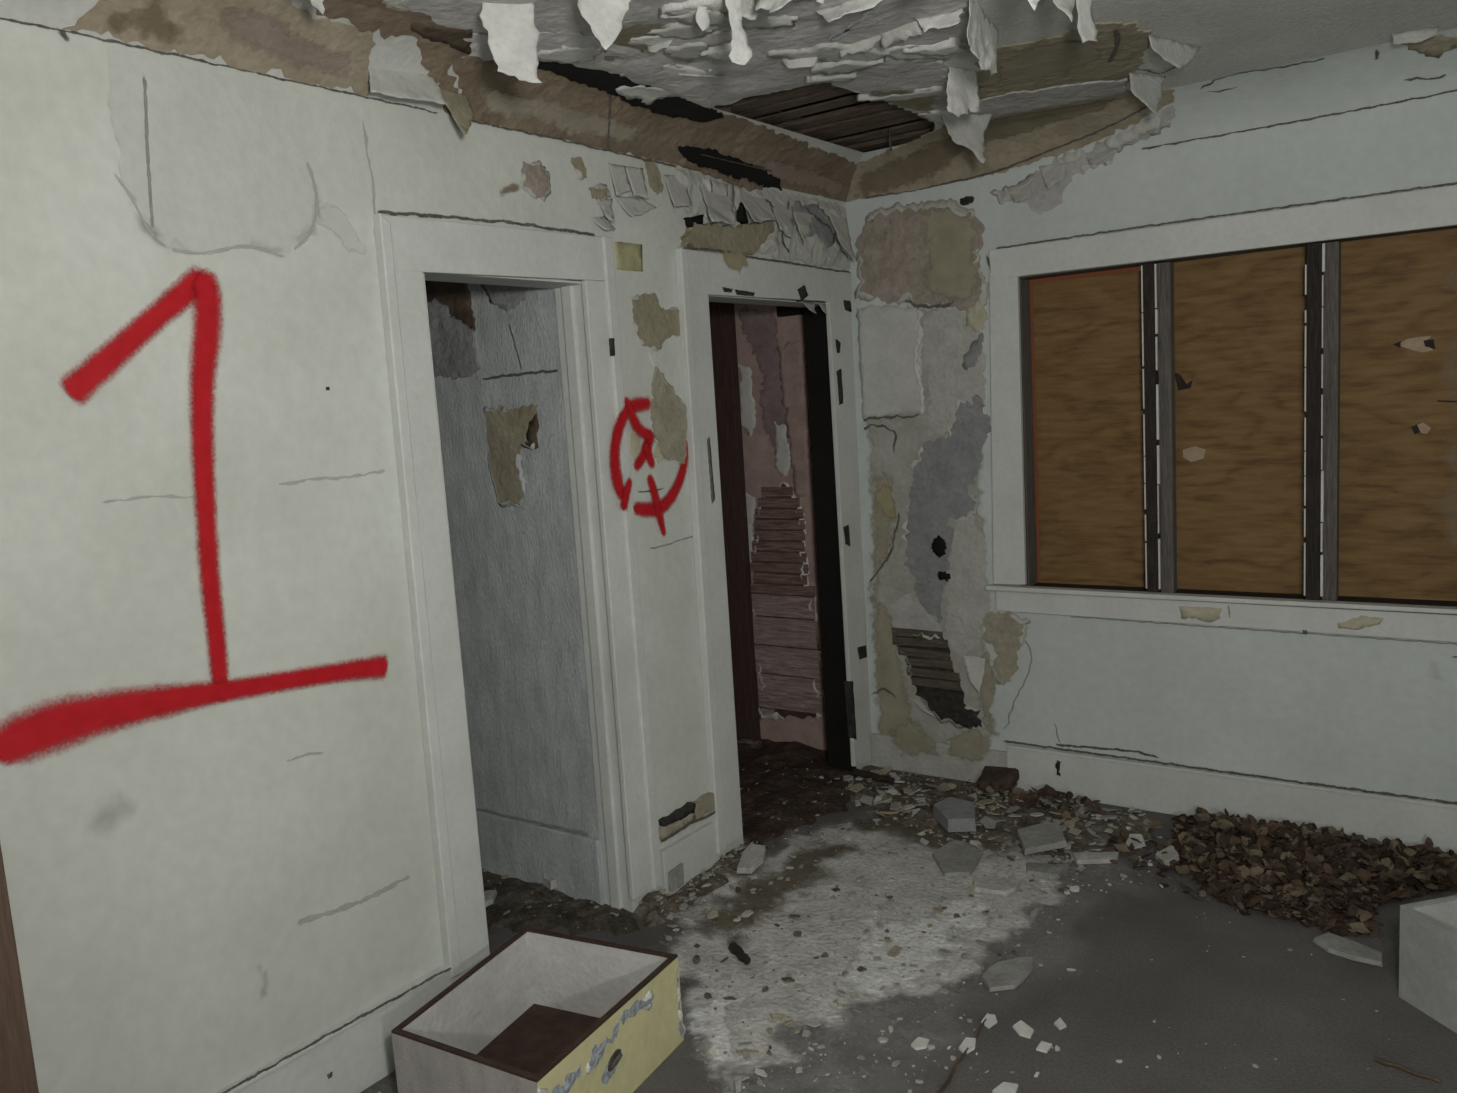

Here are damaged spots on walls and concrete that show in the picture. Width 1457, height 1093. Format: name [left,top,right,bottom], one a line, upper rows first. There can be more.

peeling [59,0,1201,761]
peeling [1391,22,1457,59]